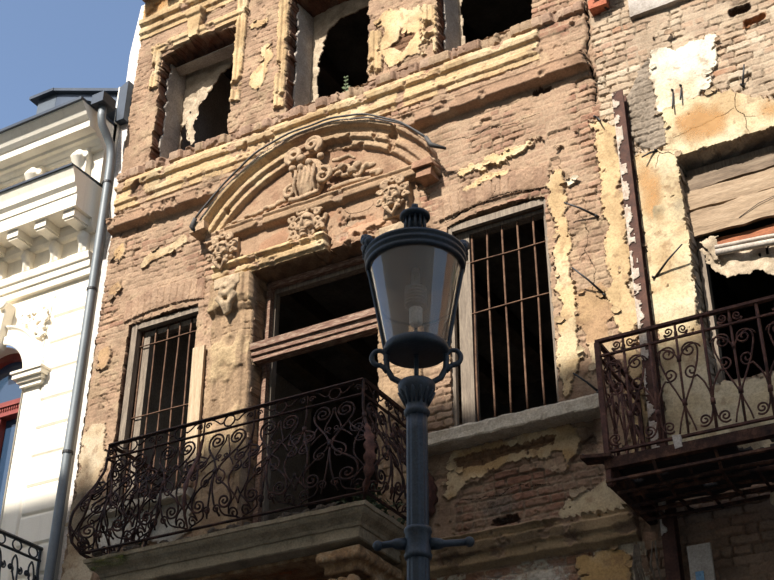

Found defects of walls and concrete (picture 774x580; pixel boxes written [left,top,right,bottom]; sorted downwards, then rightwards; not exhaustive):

peeling [249,41,275,90]
peeling [373,4,423,67]
crack [583,0,603,106]
peeling [457,135,545,192]
peeling [140,233,189,268]
peeling [545,28,774,453]
spalling [441,423,628,535]
peeling [574,544,633,580]